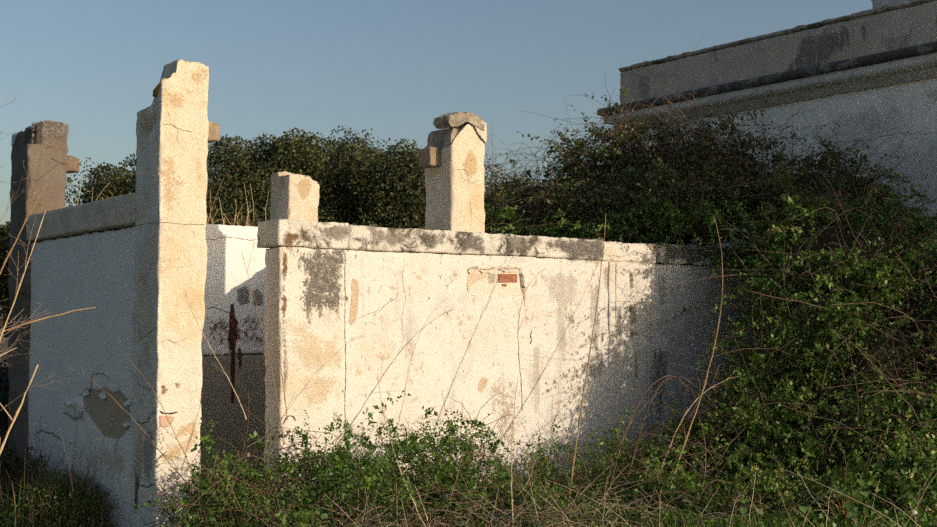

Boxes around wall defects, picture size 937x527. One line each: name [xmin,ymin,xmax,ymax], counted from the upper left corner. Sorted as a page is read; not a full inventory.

water stain [788,26,866,70]
water stain [419,230,440,249]
water stain [462,233,485,254]
water stain [547,237,605,261]
water stain [288,226,351,324]
flaking render [446,265,527,308]
water stain [617,305,638,335]
corrosion [228,304,242,404]
flaking render [81,388,131,439]